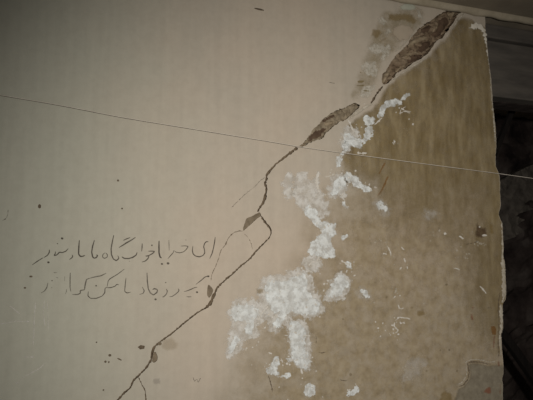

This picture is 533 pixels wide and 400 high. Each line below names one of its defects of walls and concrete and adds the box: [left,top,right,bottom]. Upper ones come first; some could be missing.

spalling [362,4,462,84]
spalling [469,22,488,56]
spalling [300,103,359,147]
water stain [226,19,506,400]
crack [117,147,298,400]
spalling [498,223,506,354]
flaking render [456,359,503,400]